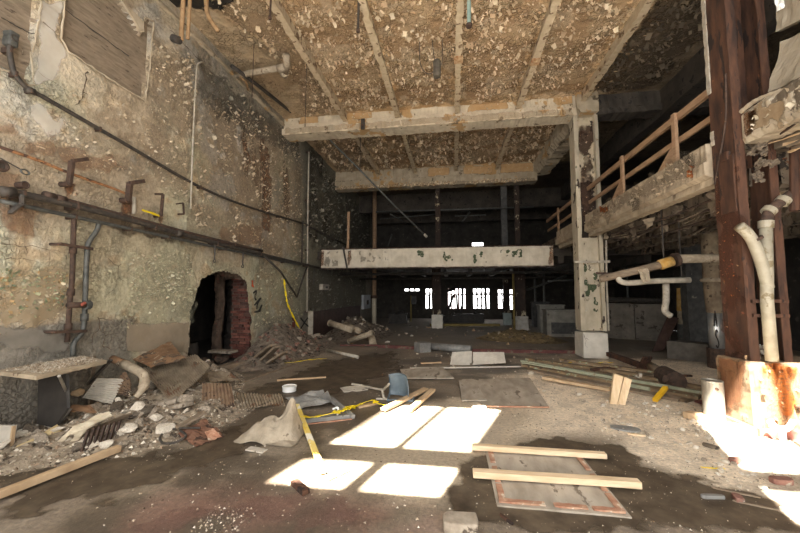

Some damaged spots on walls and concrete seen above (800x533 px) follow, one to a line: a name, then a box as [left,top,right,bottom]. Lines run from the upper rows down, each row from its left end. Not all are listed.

crack [76,71,89,107]
spalling [60,0,633,258]
corrosion [743,110,756,135]
spalling [744,83,800,212]
spalling [125,246,303,365]
peeling [584,264,598,312]
corrosion [717,357,745,408]
corrosion [762,363,797,423]